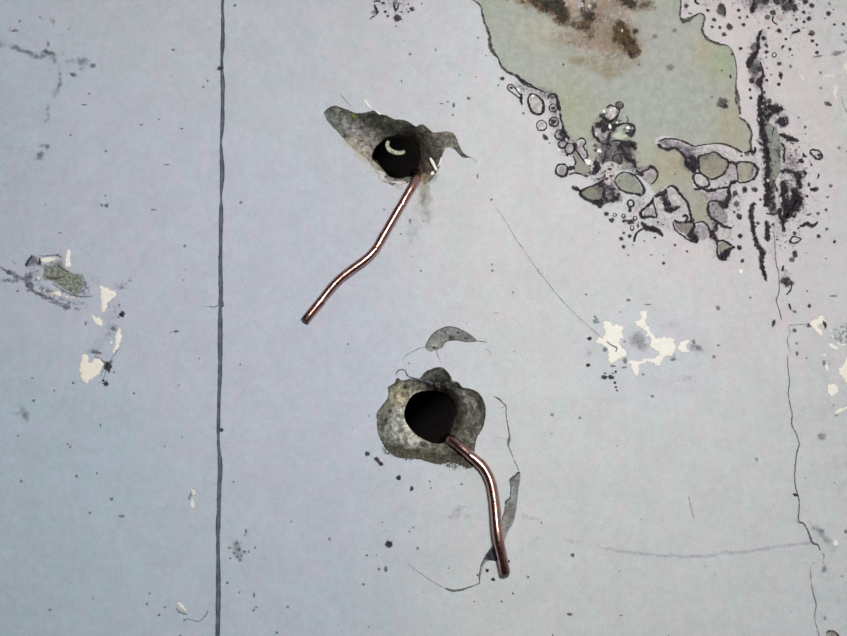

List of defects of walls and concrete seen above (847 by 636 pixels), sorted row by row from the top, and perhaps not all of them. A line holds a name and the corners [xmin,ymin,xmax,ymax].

spalling [324,95,477,186]
peeling [473,0,754,234]
peeling [763,106,781,216]
peeling [822,41,847,106]
peeling [4,249,125,386]
spalling [376,326,486,469]
peeling [587,311,701,391]
crack [774,237,824,555]
peeling [810,315,847,371]
peeling [828,356,847,416]